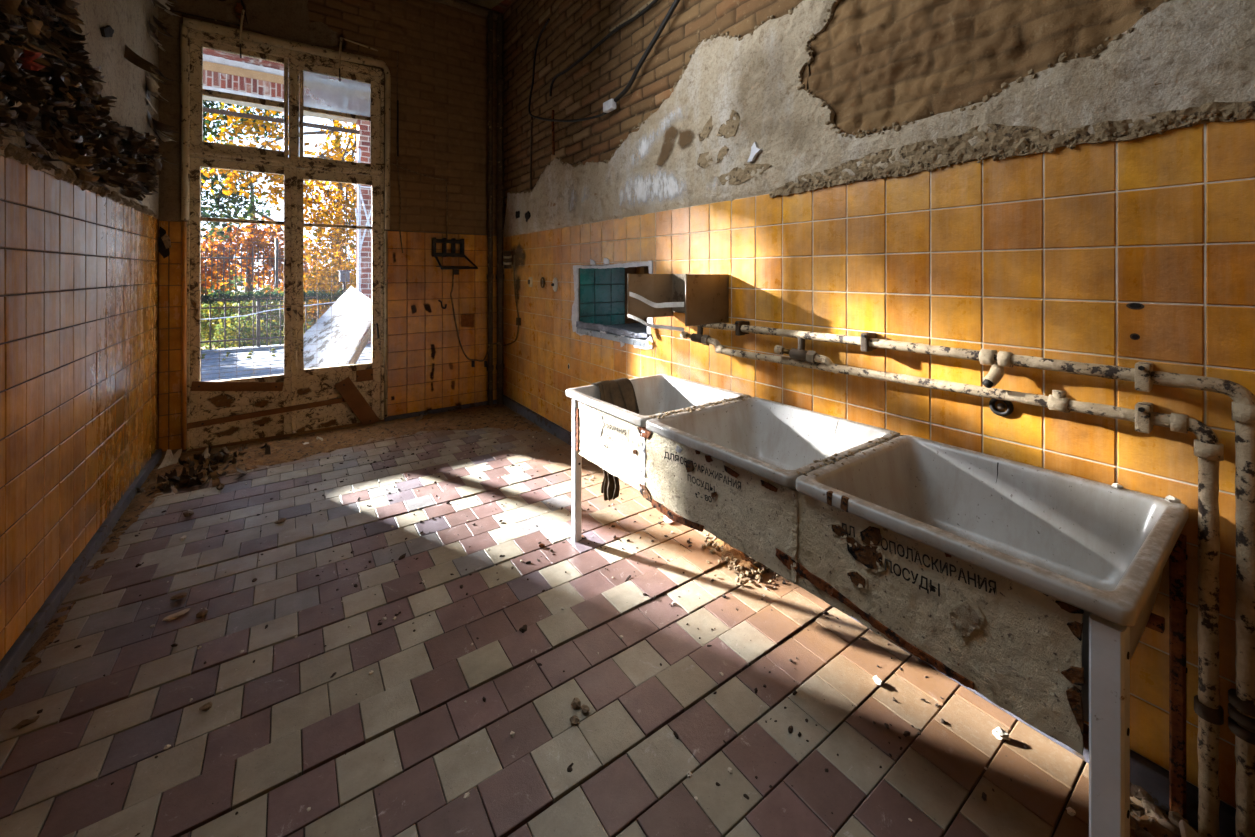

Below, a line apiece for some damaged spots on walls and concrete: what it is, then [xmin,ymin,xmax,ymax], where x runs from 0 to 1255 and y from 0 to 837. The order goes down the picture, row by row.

peeling [0,0,181,258]
flaking render [502,0,803,227]
flaking render [769,0,1255,198]